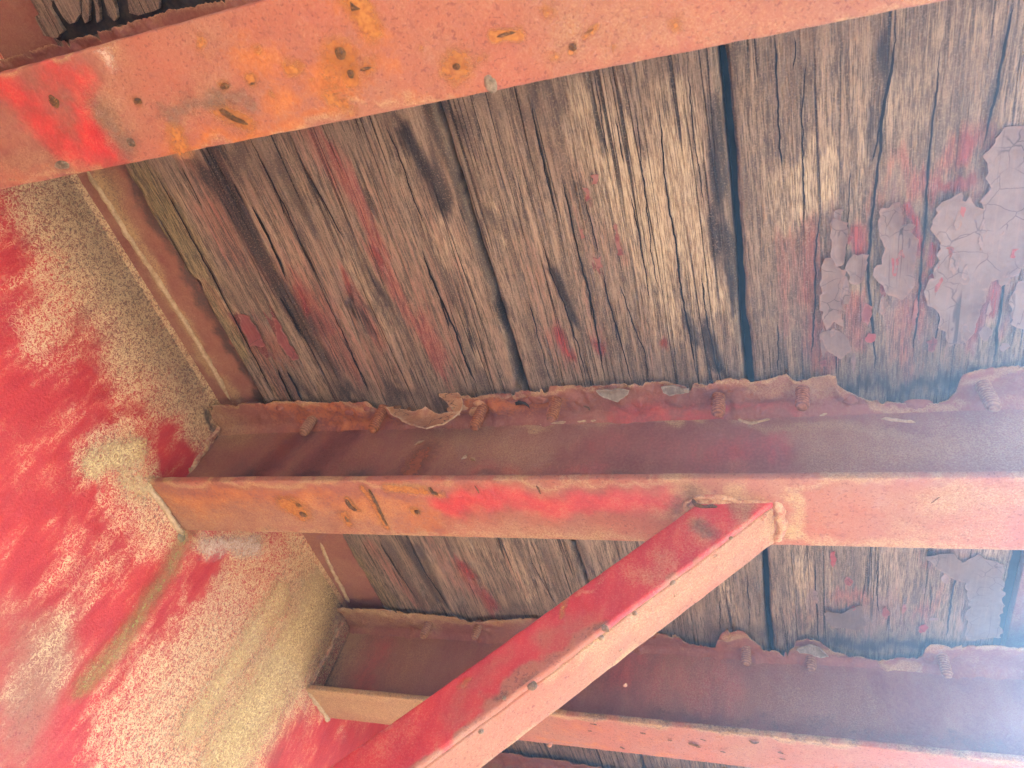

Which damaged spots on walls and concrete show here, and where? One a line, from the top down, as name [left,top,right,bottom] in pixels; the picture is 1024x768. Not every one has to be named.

rust [323,40,374,88]
rust [341,0,381,42]
rust [212,103,255,131]
crack [384,122,424,223]
crack [528,68,720,386]
crack [846,17,896,368]
peeling [819,126,1024,374]
crack [423,254,477,385]
rust [340,443,443,530]
peeling [926,553,1006,641]